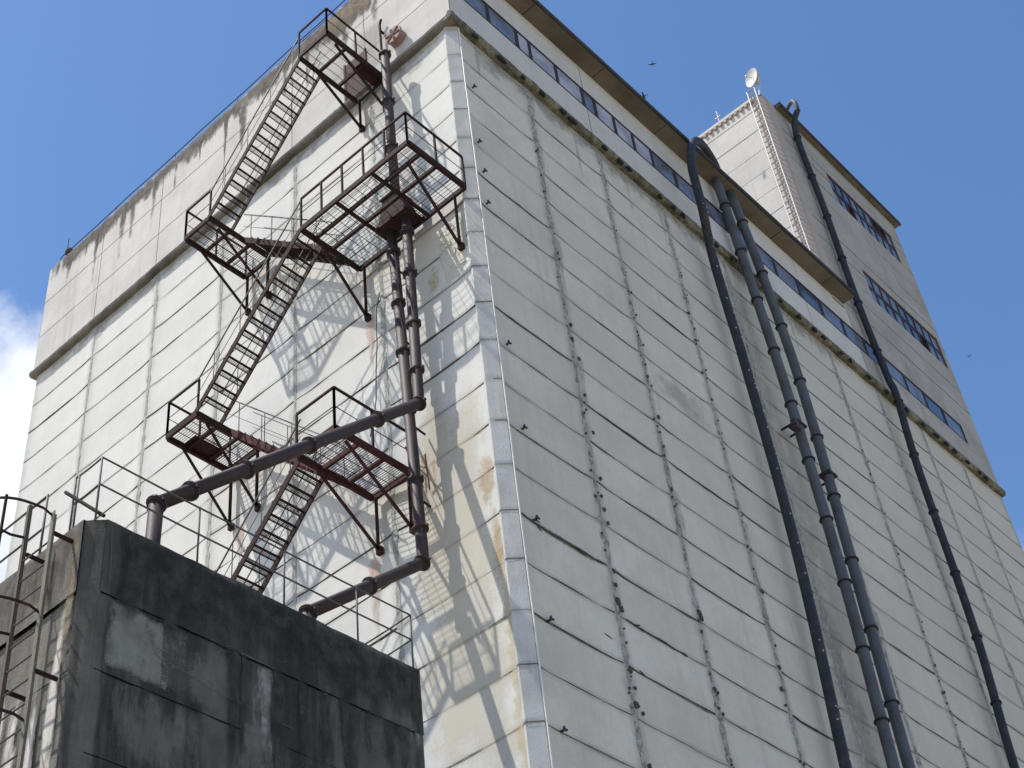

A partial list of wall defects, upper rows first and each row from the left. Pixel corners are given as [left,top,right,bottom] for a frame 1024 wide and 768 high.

leakage [56,0,376,273]
leakage [106,534,421,768]